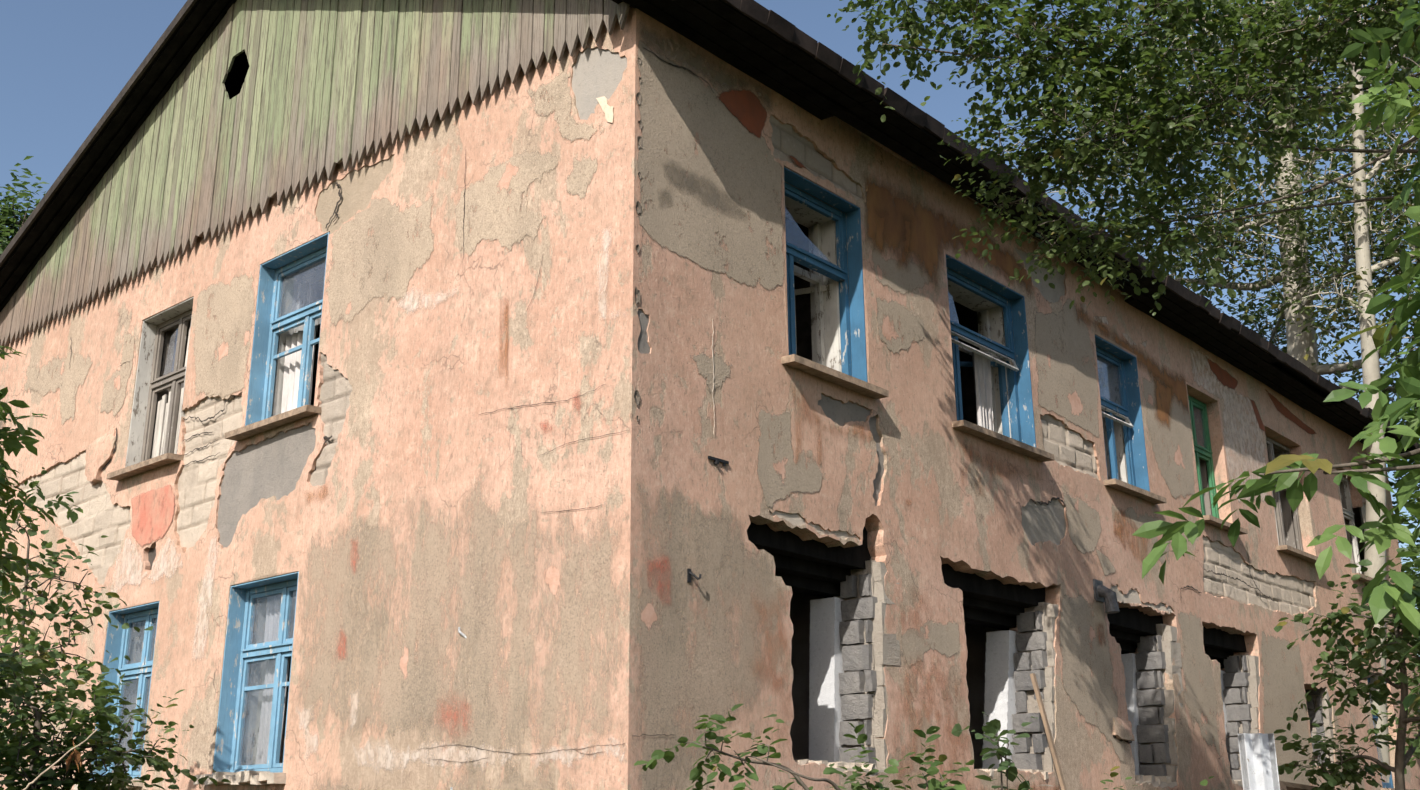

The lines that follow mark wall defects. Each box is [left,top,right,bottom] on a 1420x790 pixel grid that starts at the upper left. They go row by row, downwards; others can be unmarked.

spalling [17,273,353,585]